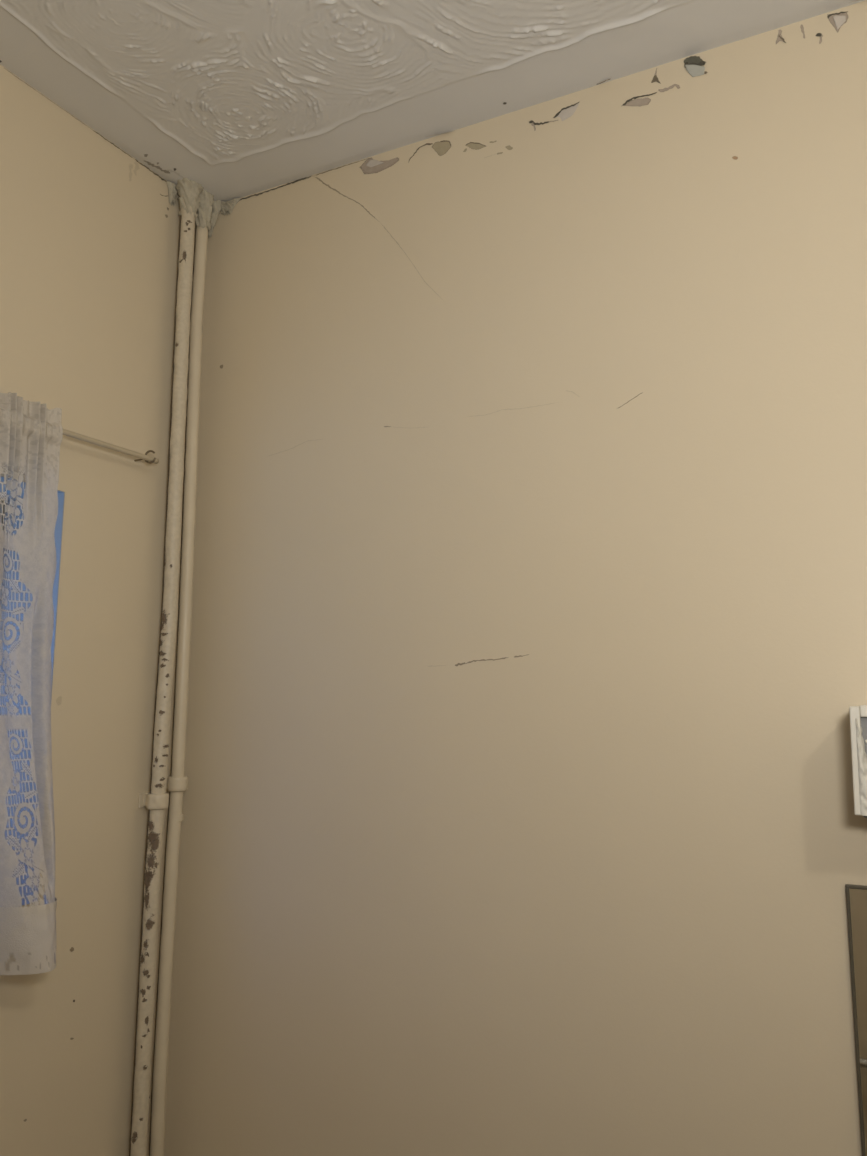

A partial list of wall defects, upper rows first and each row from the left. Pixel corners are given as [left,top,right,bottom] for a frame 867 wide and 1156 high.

peeling [828,0,859,32]
peeling [684,56,708,77]
peeling [623,68,680,106]
peeling [529,102,579,131]
peeling [361,130,512,174]